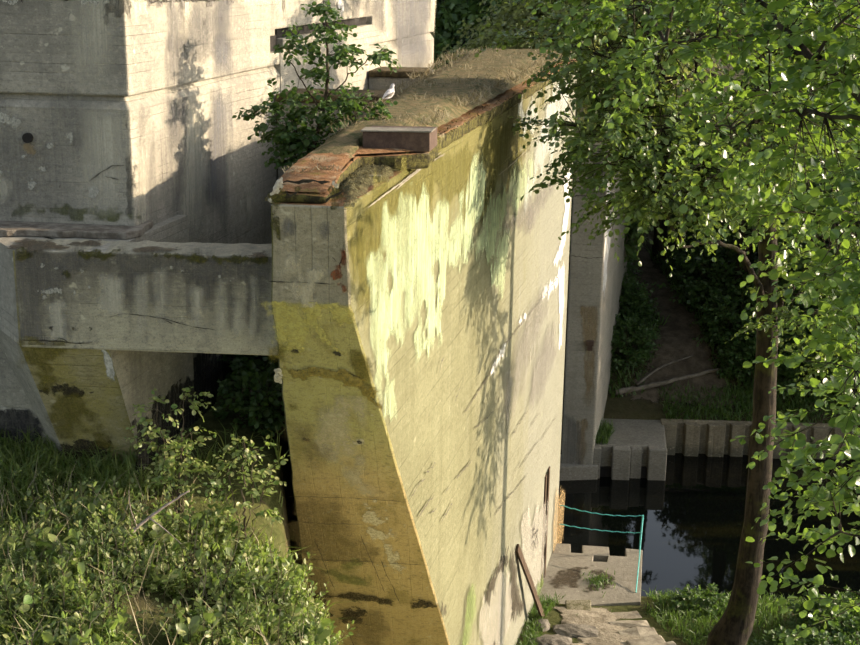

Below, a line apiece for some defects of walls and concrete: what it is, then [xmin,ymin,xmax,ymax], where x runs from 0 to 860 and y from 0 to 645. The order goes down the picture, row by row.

crack [145,0,223,25]
leakage [133,0,264,84]
leakage [169,93,232,227]
leakage [0,238,269,477]
crack [111,313,214,330]
leakage [245,270,354,355]
rust [330,250,346,292]
leakage [367,72,571,422]
leakage [295,504,394,644]
leakage [410,598,447,616]
leakage [486,547,524,623]